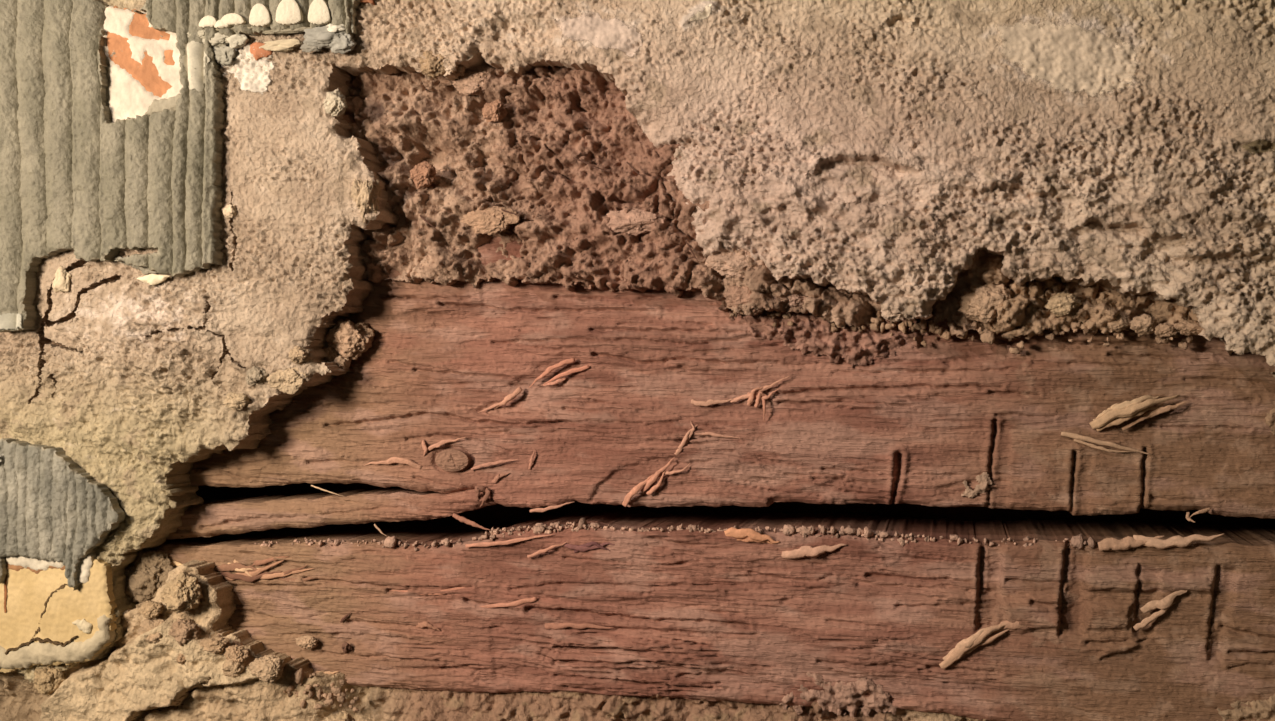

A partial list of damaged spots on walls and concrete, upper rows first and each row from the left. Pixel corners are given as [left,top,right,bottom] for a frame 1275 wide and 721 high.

peeling [0,0,375,332]
crack [229,193,240,271]
spalling [802,151,1197,261]
spalling [1208,250,1275,290]
crack [25,260,121,404]
crack [146,300,246,378]
spalling [205,355,247,390]
peeling [0,438,125,591]